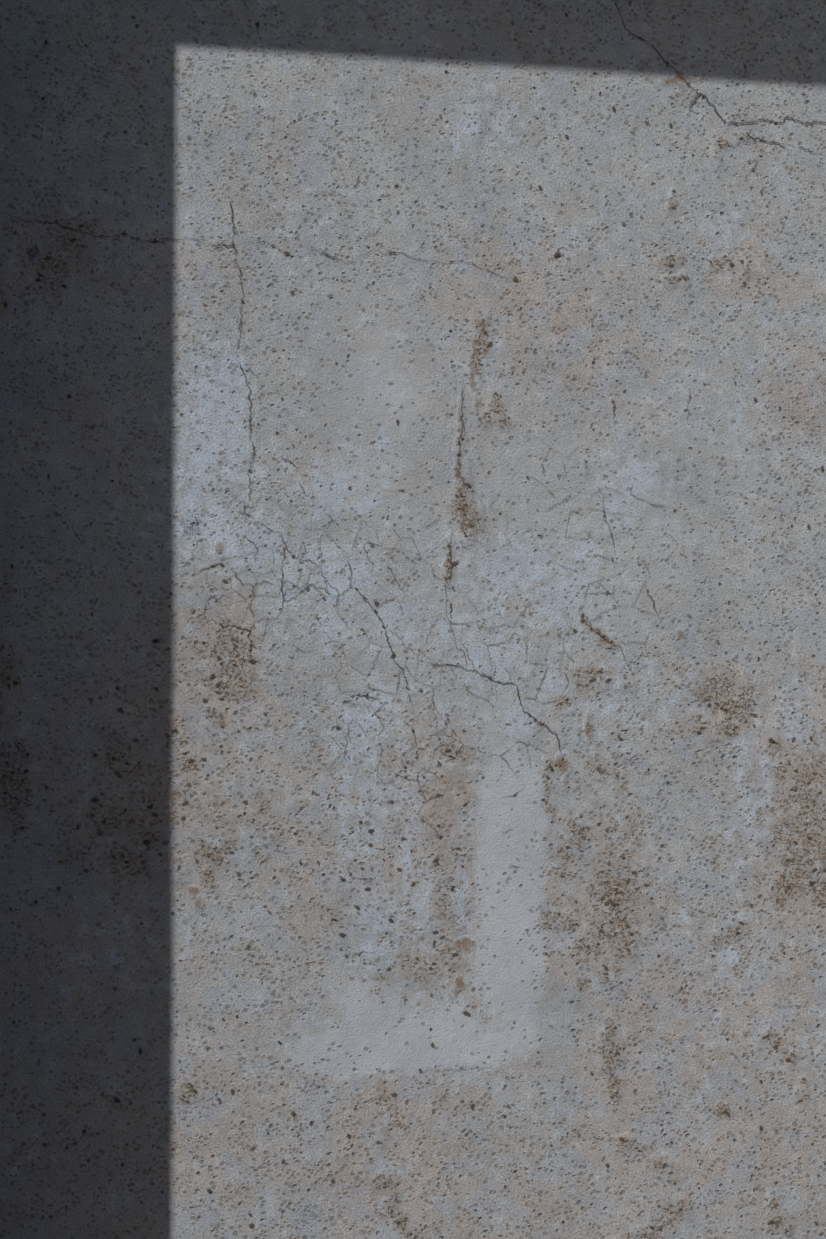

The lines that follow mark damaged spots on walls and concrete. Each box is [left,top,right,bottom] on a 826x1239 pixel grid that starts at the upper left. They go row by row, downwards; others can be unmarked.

crack [614,0,826,177]
crack [15,202,574,796]
damp [157,326,668,744]
corrosion [448,383,478,592]
crack [546,560,660,655]